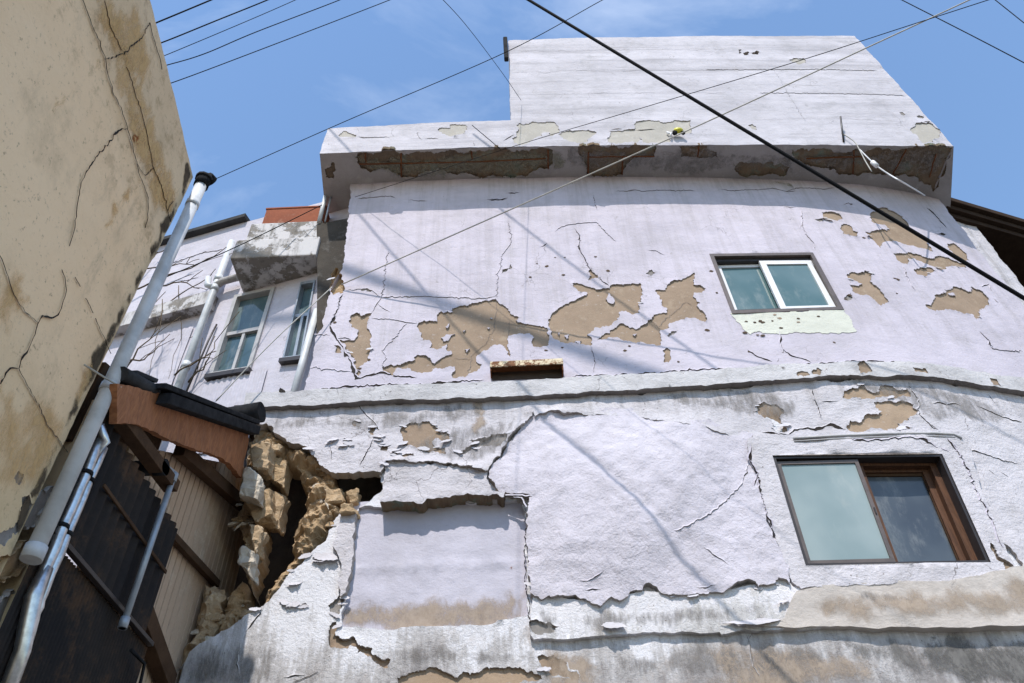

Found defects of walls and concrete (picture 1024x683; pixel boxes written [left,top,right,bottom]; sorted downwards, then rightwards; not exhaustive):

crack [69,0,174,246]
leakage [102,2,191,256]
spalling [356,120,719,179]
spalling [734,112,952,191]
crack [0,256,111,452]
leakage [69,272,143,419]
crack [310,192,520,466]
peeling [382,256,718,378]
crack [673,331,1022,589]
peeling [328,592,391,668]
leakage [669,636,1024,683]
leakage [823,580,1024,616]